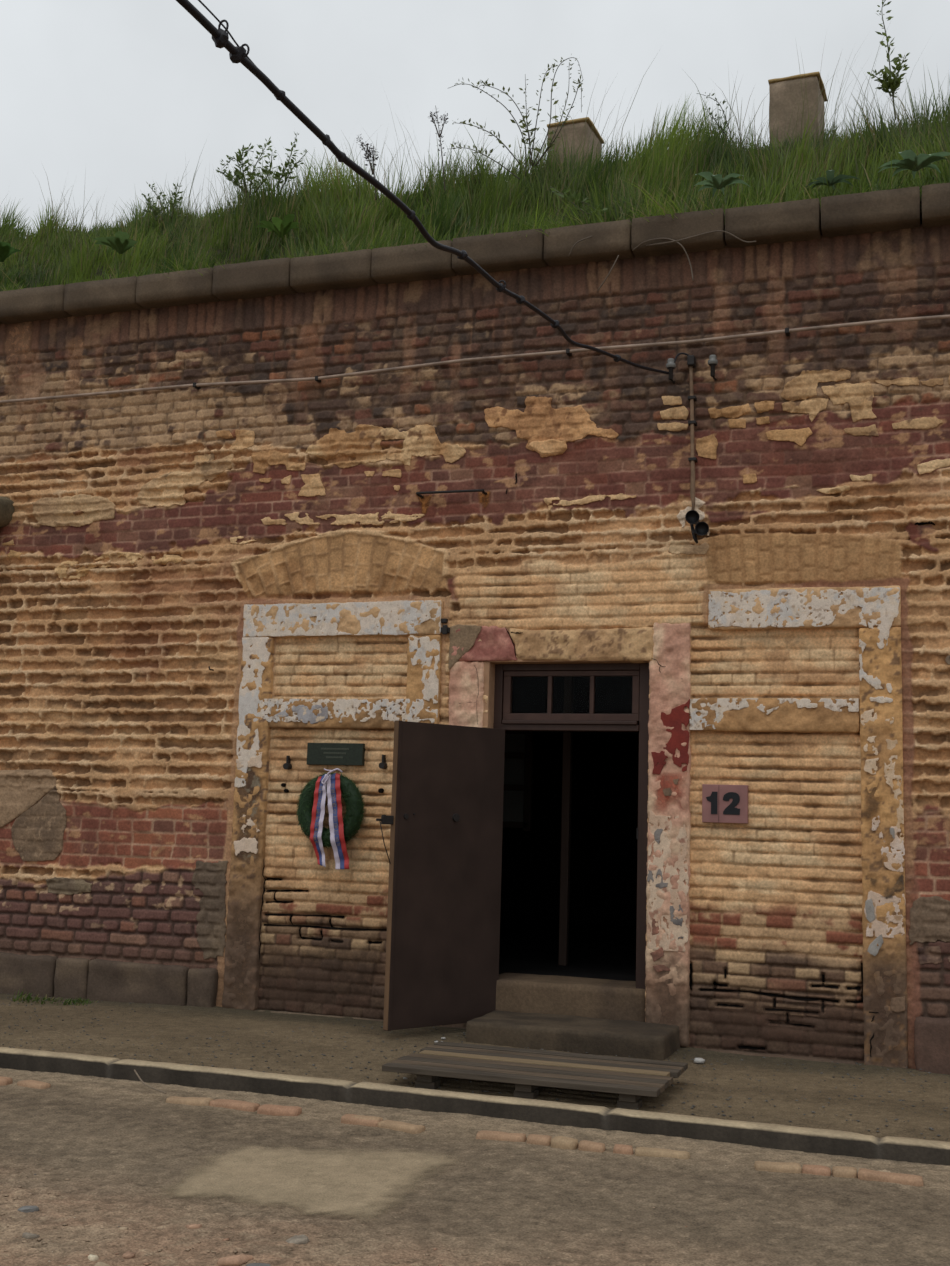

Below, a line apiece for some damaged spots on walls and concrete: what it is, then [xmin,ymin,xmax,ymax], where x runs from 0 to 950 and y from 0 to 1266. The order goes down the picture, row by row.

peeling [484,396,619,458]
peeling [657,396,718,460]
peeling [708,369,950,446]
peeling [137,424,466,508]
peeling [261,511,425,525]
peeling [544,493,637,511]
peeling [743,473,757,484]
peeling [234,600,441,788]
peeling [690,587,905,872]
peeling [233,815,260,856]
peeling [647,810,689,972]
peeling [864,891,905,956]